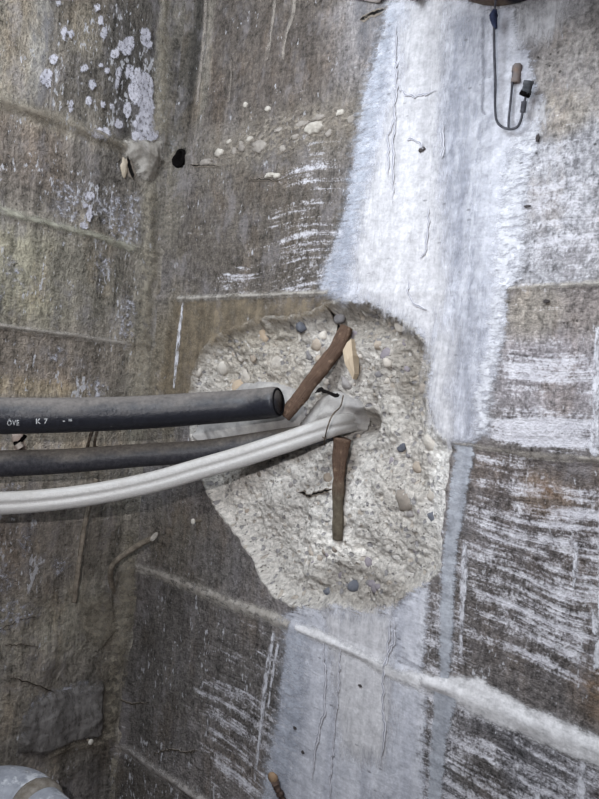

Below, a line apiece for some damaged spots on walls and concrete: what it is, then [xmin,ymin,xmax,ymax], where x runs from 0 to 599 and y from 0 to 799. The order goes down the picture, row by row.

rust [282,324,353,420]
rust [332,436,351,541]